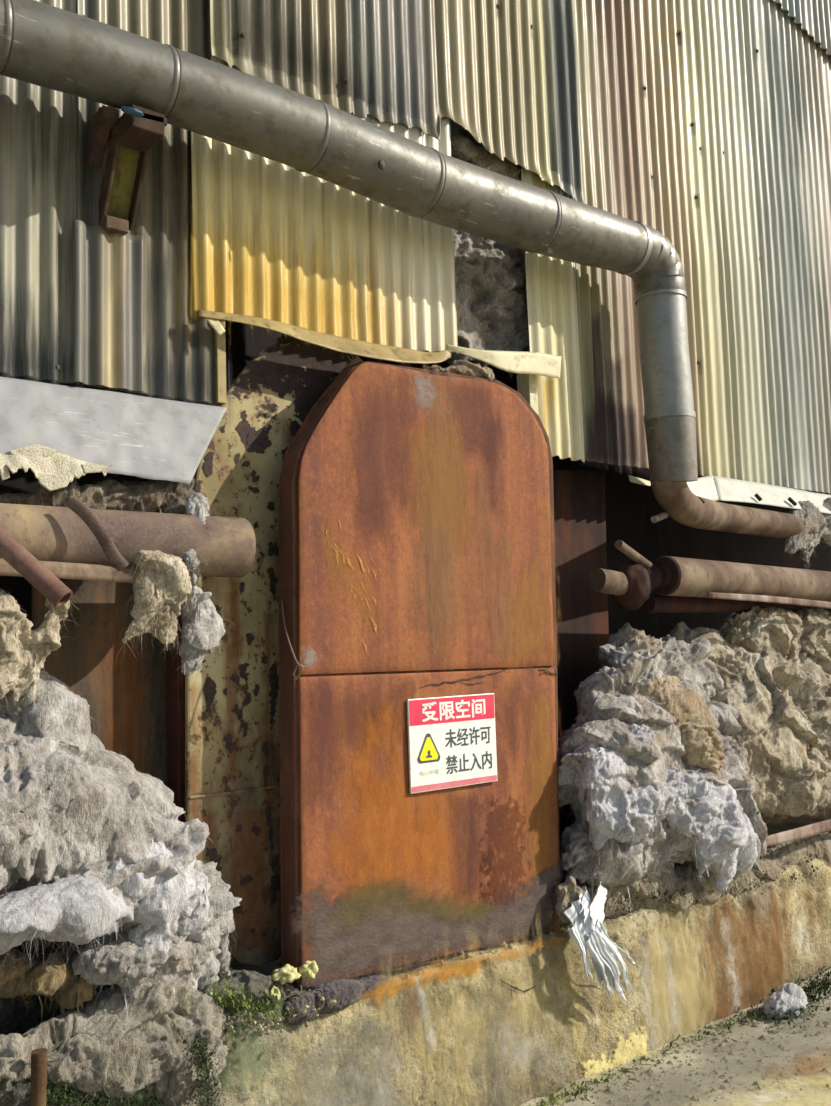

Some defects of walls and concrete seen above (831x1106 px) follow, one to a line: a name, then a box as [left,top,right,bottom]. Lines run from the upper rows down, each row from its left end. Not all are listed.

peeling [0,444,113,491]
peeling [194,451,214,496]
peeling [259,541,279,599]
peeling [203,648,279,852]
peeling [205,847,222,871]
damp [298,866,561,1000]
rust [705,901,791,1022]